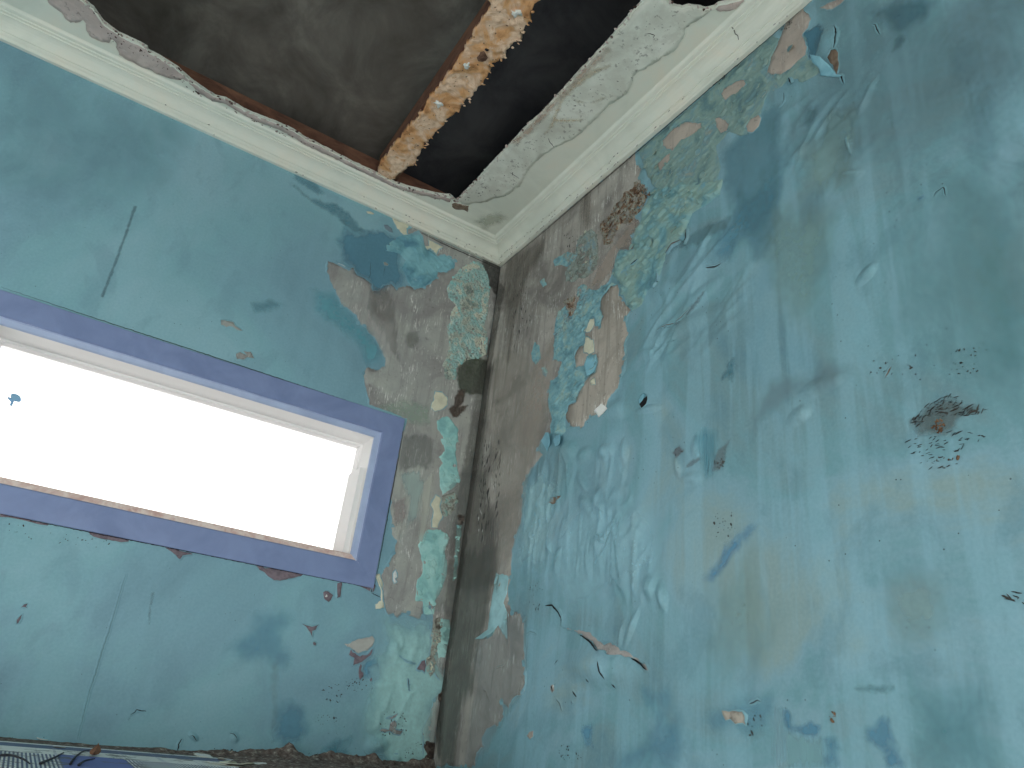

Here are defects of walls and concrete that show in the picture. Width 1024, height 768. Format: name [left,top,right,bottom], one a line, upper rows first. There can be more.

peeling [47,0,747,212]
damp [464,252,531,333]
damp [322,348,501,766]
peeling [322,152,647,768]
spalling [721,709,762,736]